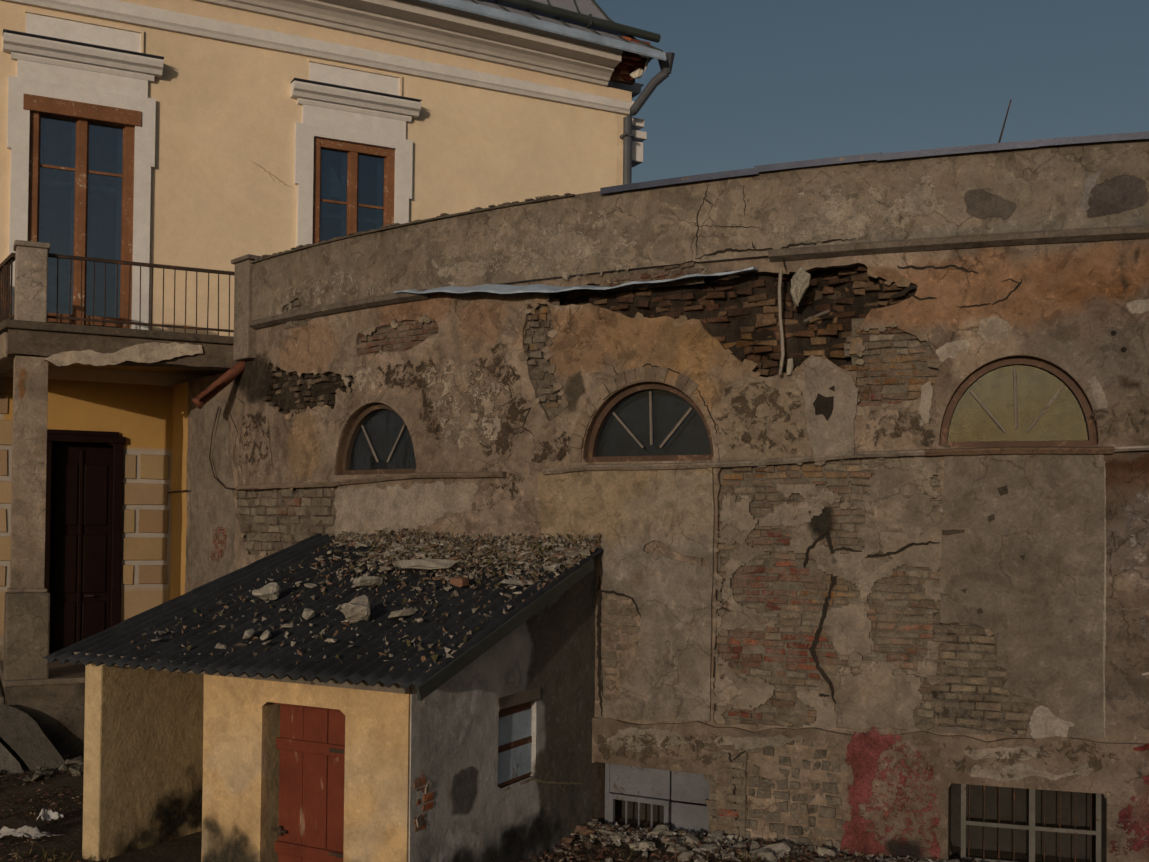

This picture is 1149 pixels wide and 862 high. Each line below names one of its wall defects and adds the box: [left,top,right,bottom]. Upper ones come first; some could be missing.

flaking render [610,36,650,85]
crack [695,184,855,270]
crack [891,264,1022,308]
flaking render [234,261,1119,861]
crack [803,533,940,704]
leakage [420,678,487,790]
leakage [447,565,596,862]
leakage [121,786,255,862]
peeling [1109,796,1149,857]